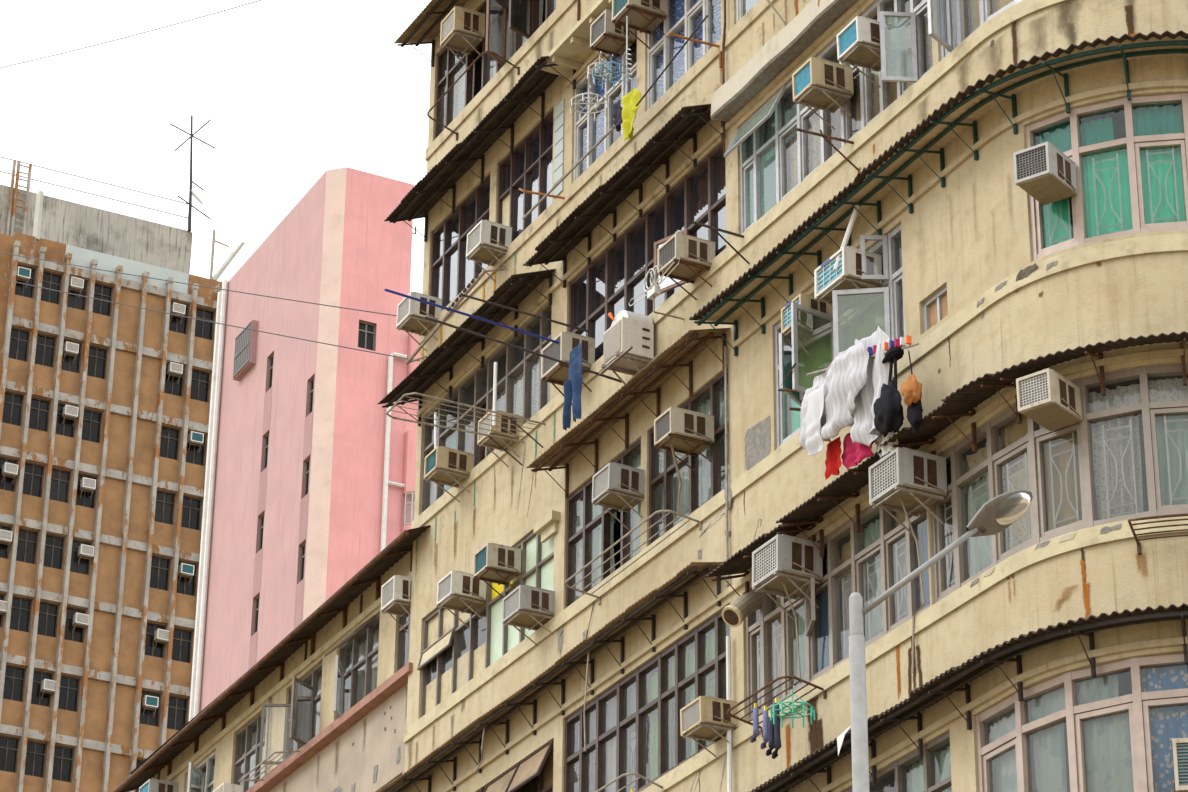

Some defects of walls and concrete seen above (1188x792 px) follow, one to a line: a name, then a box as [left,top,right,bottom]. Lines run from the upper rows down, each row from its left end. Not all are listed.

rust [1080,560,1090,619]